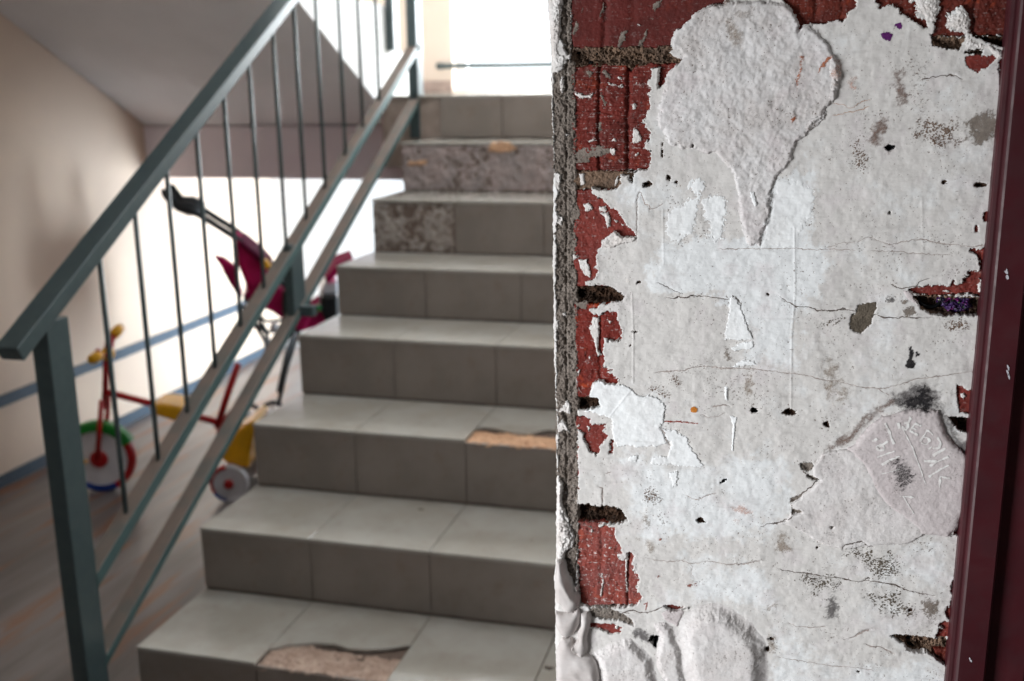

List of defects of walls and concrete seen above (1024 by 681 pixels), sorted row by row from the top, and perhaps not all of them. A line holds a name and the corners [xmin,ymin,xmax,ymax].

spalling [783,0,857,29]
spalling [875,0,1007,44]
peeling [758,178,816,251]
crack [717,237,984,289]
spalling [908,247,984,295]
spalling [466,0,729,633]
crack [659,283,742,305]
crack [782,298,922,319]
crack [656,366,970,395]
crack [760,462,819,527]
crack [644,557,935,596]
spalling [256,645,401,681]